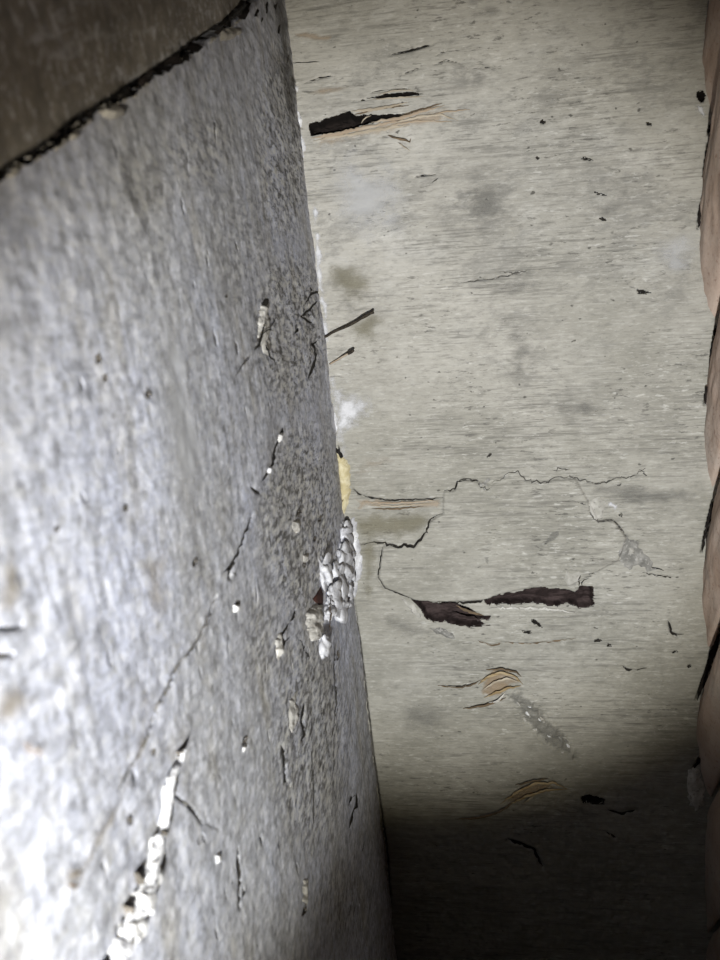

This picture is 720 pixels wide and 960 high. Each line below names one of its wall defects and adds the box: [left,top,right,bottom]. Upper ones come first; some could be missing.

water stain [318,517,422,660]
crack [439,598,483,606]
spalling [402,572,595,639]
crack [353,467,647,598]
peeling [438,668,521,709]
crack [107,750,220,960]